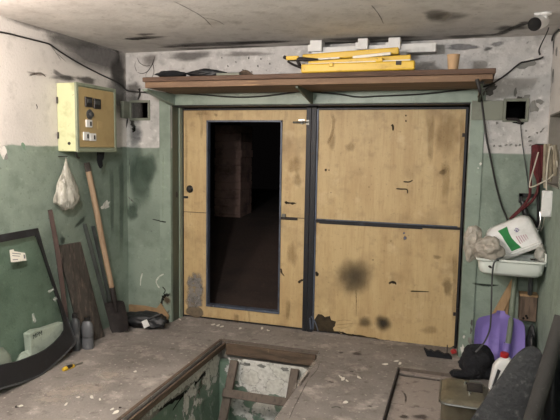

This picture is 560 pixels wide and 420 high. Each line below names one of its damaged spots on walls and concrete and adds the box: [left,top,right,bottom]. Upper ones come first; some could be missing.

water stain [54,32,141,127]
water stain [129,158,154,197]
peeling [144,354,308,420]